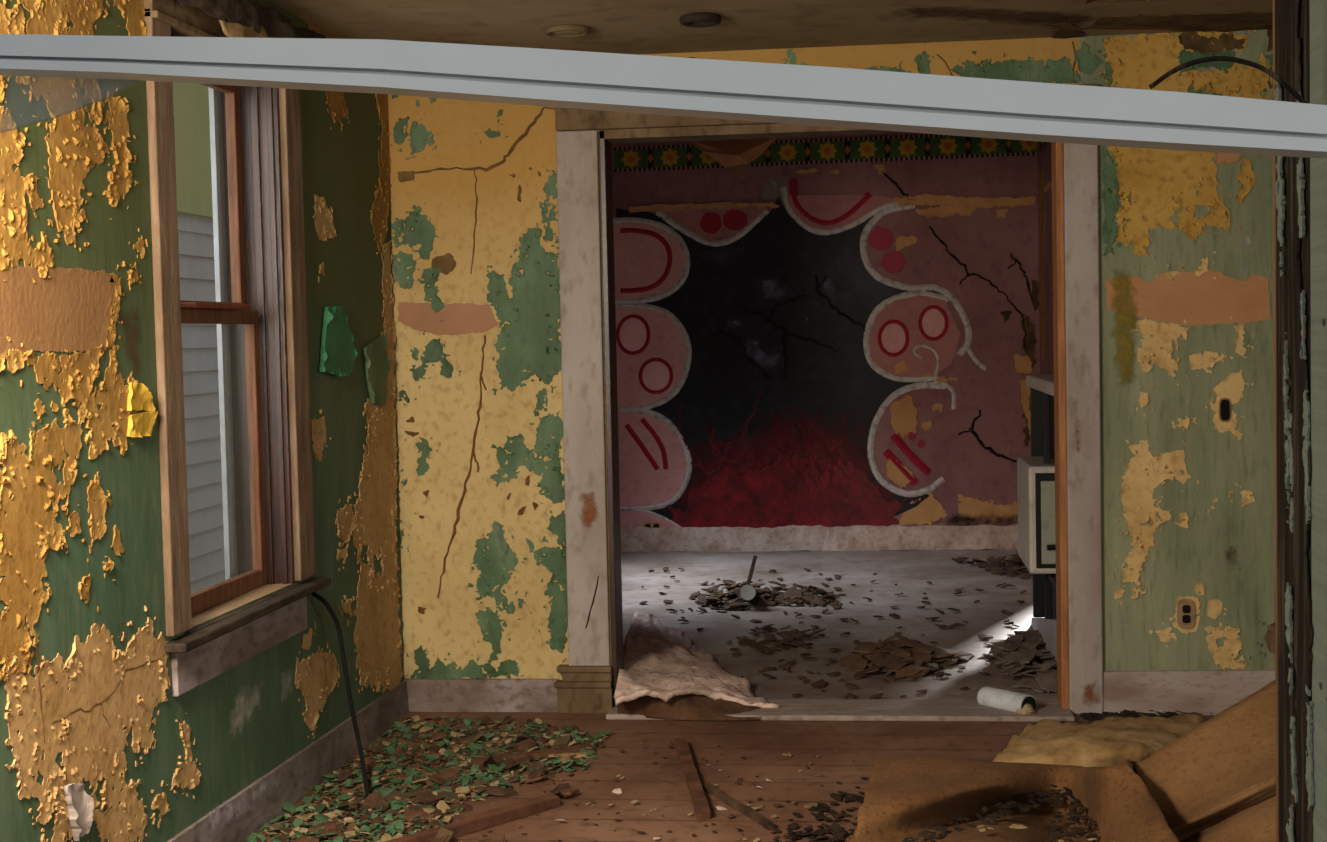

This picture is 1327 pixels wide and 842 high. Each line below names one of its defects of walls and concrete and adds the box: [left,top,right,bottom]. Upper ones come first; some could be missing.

peeling [864,43,934,74]
peeling [951,0,1301,103]
crack [415,107,555,274]
crack [882,172,911,200]
crack [929,226,1053,351]
peeling [0,75,201,842]
peeling [294,91,569,738]
crack [437,335,487,598]
peeling [886,459,1018,526]
crack [958,410,1017,462]
peeling [1098,146,1327,842]
crack [35,641,161,743]